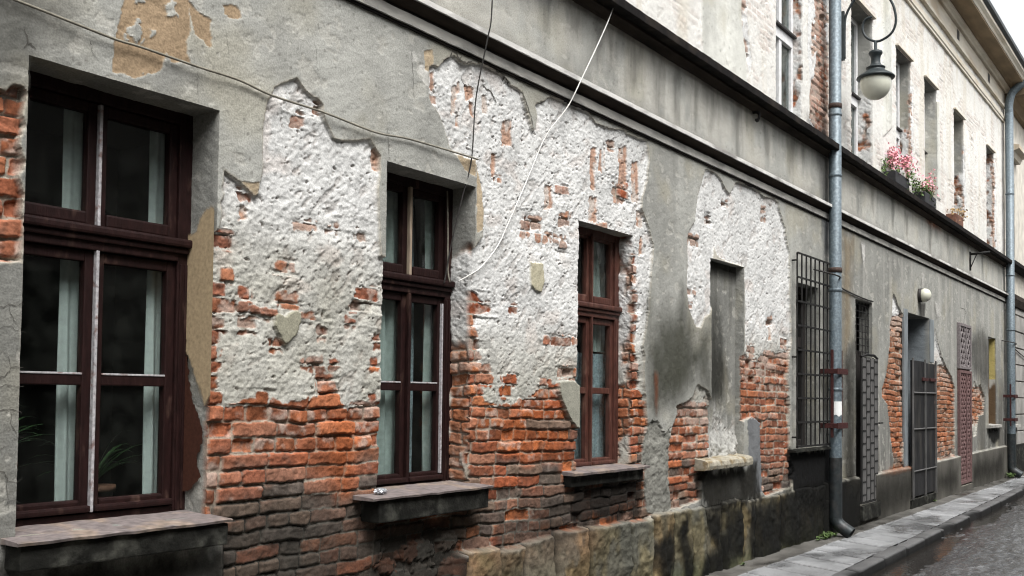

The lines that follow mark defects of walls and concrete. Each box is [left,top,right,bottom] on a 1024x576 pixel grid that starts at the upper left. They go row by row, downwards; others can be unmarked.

peeling [113,0,213,79]
flaking render [741,0,753,76]
flaking render [0,84,27,262]
flaking render [183,48,654,576]
water stain [570,479,643,527]
flaking render [667,384,712,508]
water stain [654,462,762,576]
flaking render [687,169,793,495]
flaking render [882,294,904,468]
flaking render [932,329,955,459]
flaking render [972,381,985,436]